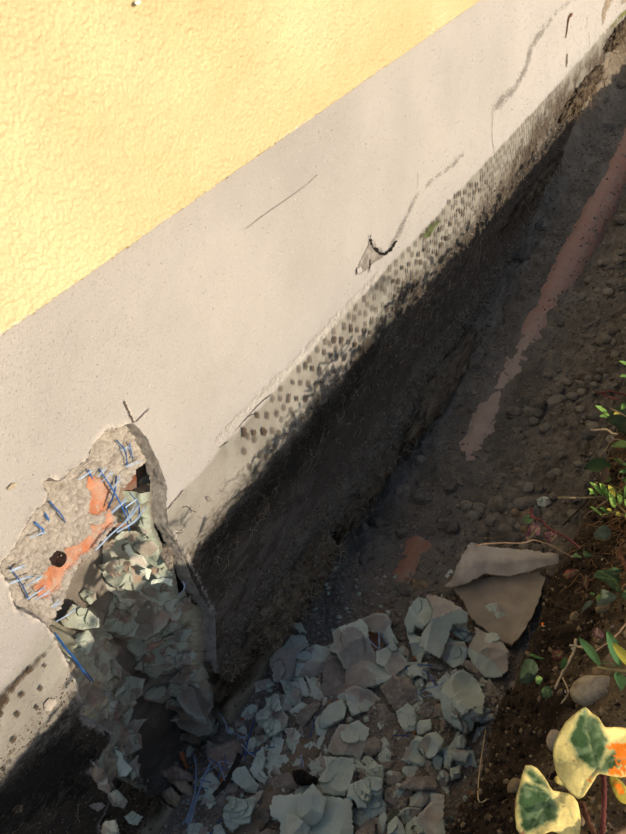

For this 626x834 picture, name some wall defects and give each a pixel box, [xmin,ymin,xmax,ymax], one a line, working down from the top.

flaking render [355,235,397,275]
damp [242,82,564,472]
flaking render [0,424,149,627]
damp [0,654,47,718]
flaking render [44,698,57,711]
damp [0,693,102,834]